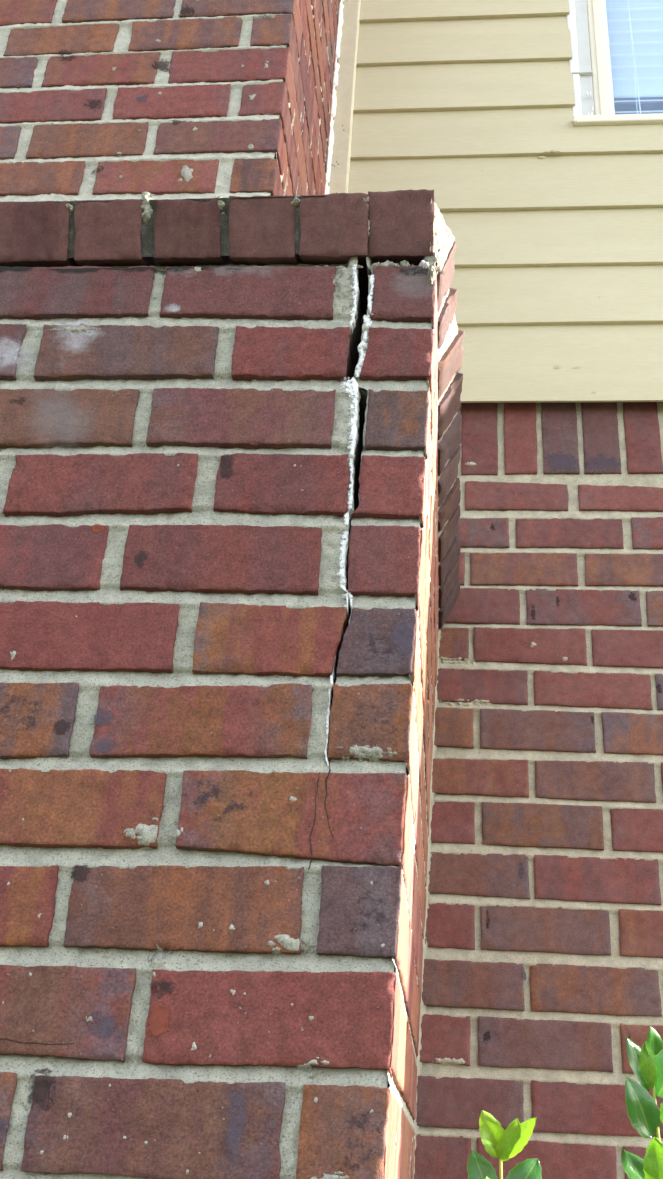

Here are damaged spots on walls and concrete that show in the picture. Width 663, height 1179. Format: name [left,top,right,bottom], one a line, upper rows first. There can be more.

crack [308,262,375,870]